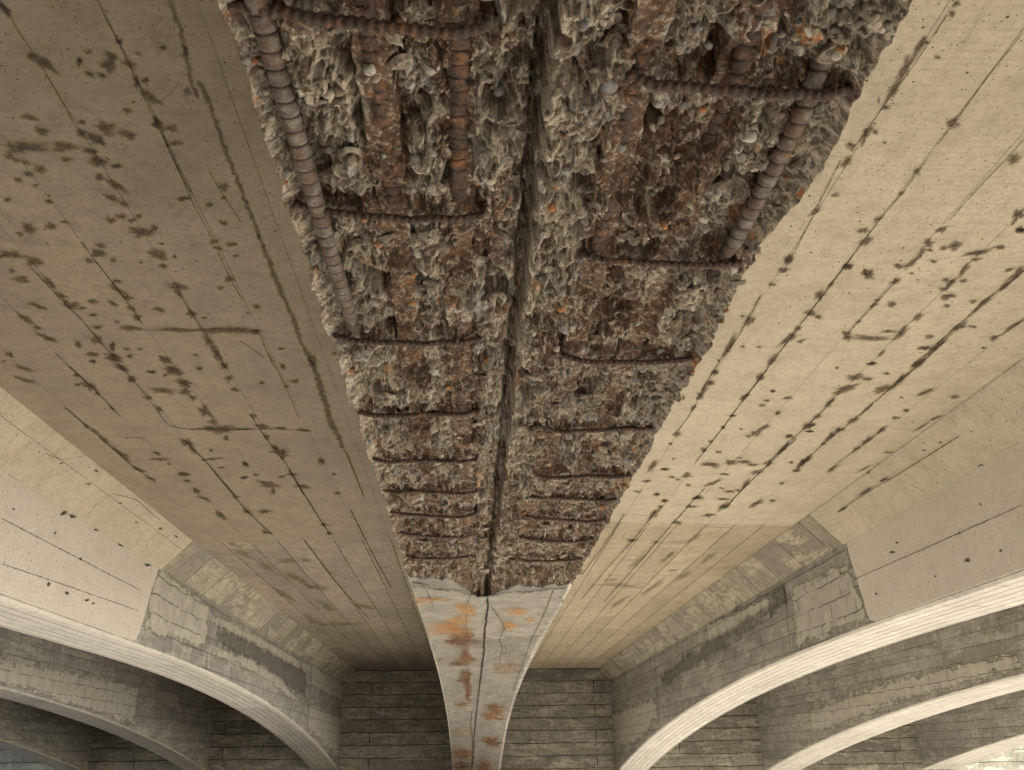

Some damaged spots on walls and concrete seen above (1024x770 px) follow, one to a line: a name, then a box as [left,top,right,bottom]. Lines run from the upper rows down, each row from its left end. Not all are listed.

water stain [6,115,176,268]
crack [28,264,371,621]
water stain [144,356,286,458]
water stain [163,2,343,448]
spalling [217,0,913,642]
crack [581,489,704,600]
water stain [635,299,990,517]
crack [695,15,1024,463]
crack [729,271,1024,512]
water stain [892,227,1004,308]
corrosion [437,604,477,706]
crack [465,583,554,769]